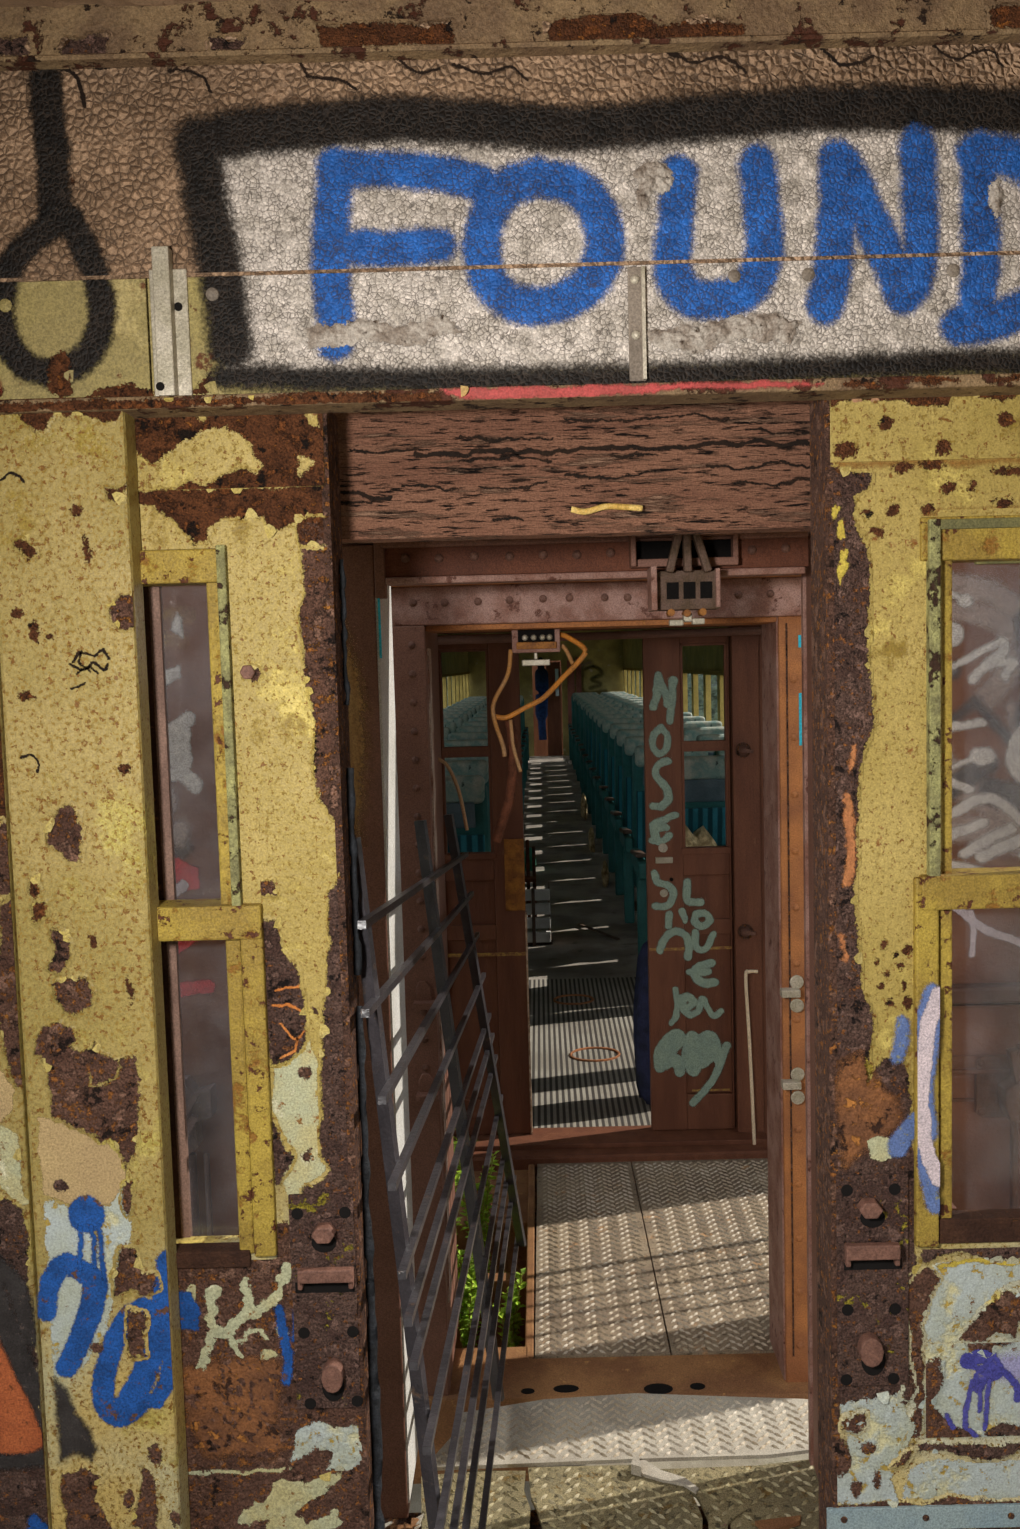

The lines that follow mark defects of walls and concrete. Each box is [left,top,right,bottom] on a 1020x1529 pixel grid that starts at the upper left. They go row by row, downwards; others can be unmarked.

corrosion [311,17,461,48]
corrosion [0,350,442,837]
peeling [0,1071,132,1380]
corrosion [0,732,145,1219]
corrosion [0,1192,362,1529]
peeling [186,1262,291,1371]
peeling [189,1421,362,1529]
peeling [272,1040,326,1195]
corrosion [260,872,349,1194]
corrosion [830,439,1020,1508]
peeling [837,1390,1020,1506]
peeling [922,1257,1020,1436]